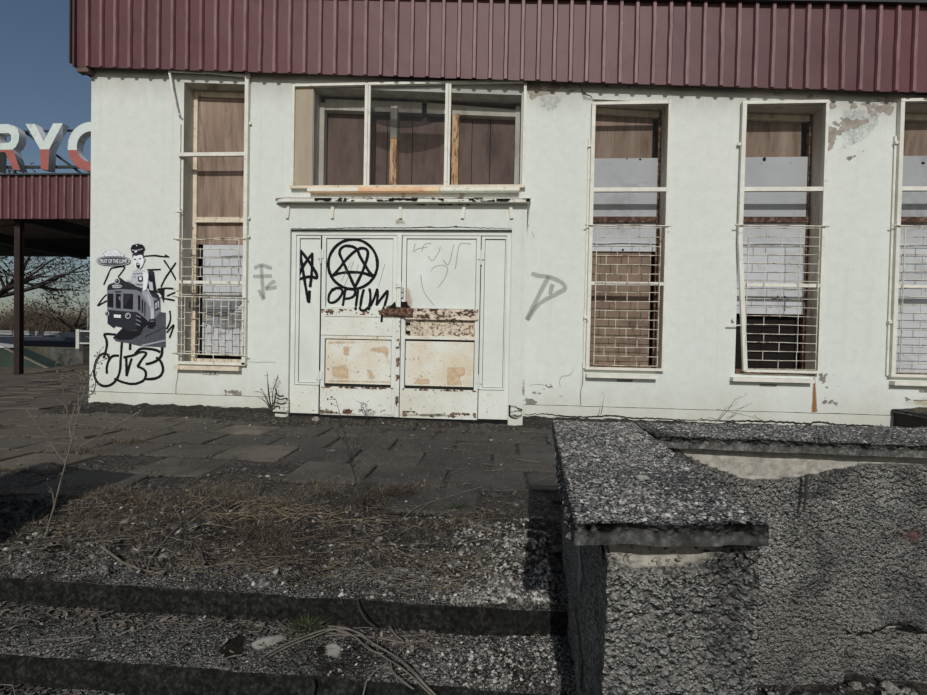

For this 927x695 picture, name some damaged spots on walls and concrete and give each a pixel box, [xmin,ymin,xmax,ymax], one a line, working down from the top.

peeling [527,83,587,100]
peeling [828,96,895,150]
peeling [321,321,417,416]